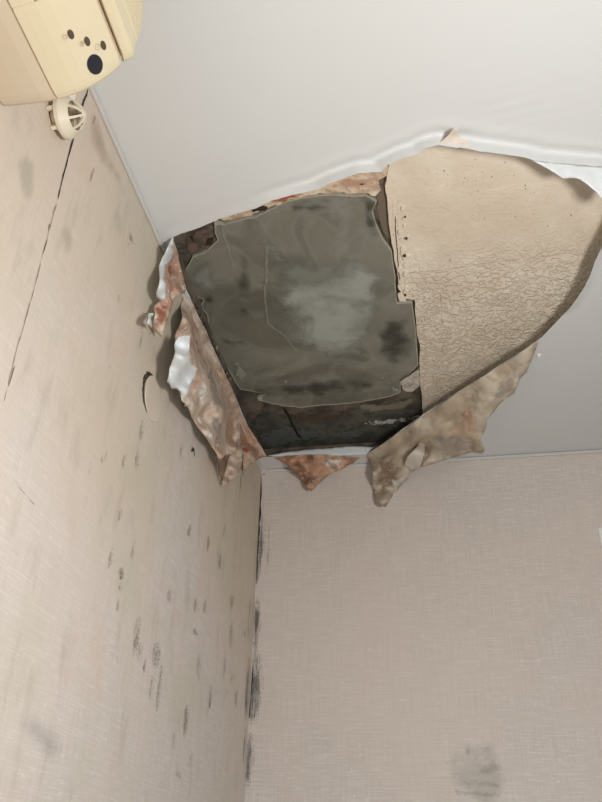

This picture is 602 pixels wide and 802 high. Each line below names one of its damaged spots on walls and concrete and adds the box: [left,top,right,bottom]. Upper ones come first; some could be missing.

flaking render [220,165,389,221]
spalling [186,228,214,253]
peeling [397,216,409,302]
spalling [191,297,231,382]
damp [173,180,421,457]
flaking render [400,366,420,392]
damp [225,601,264,786]